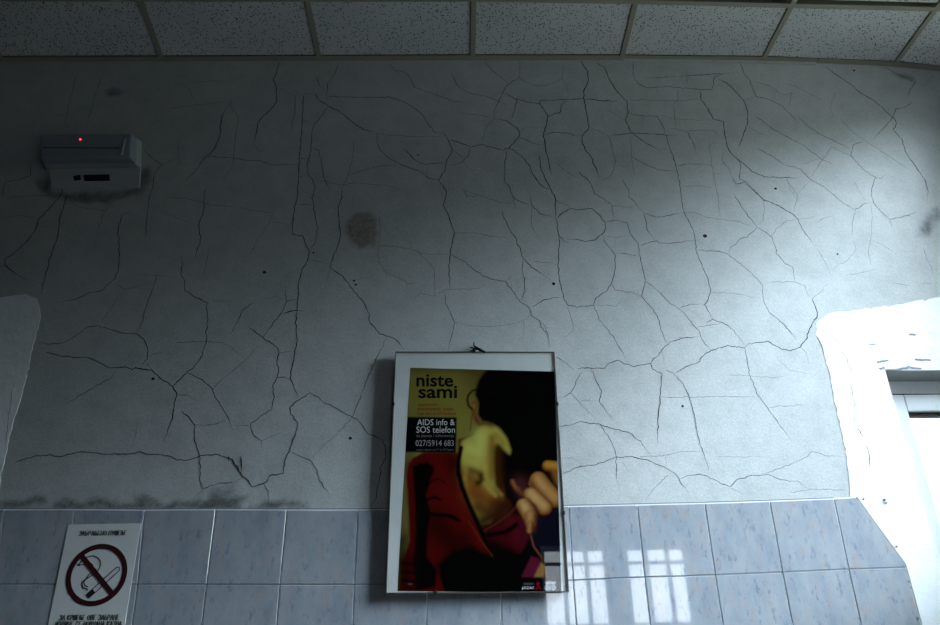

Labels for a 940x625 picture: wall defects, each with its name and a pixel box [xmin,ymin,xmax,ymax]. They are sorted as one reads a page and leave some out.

crack [2,61,931,506]